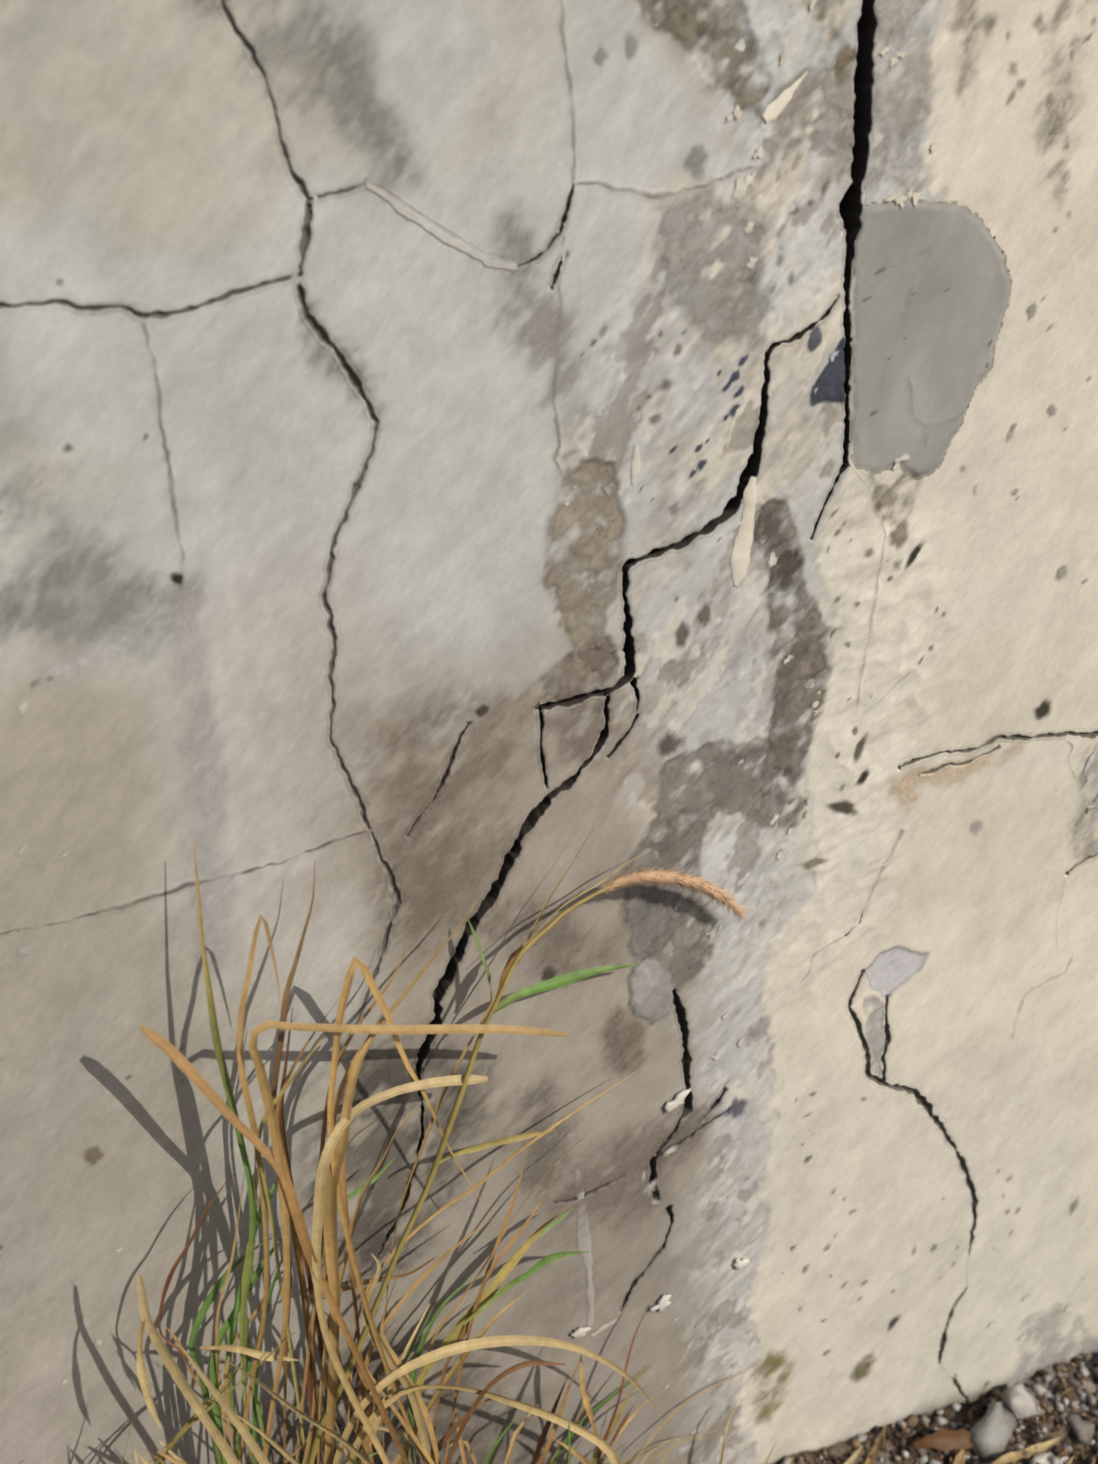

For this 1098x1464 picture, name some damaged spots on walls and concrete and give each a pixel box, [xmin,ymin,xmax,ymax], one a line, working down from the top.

peeling [639,0,856,340]
peeling [870,0,939,207]
crack [0,0,766,1050]
water stain [548,700,604,755]
flaking render [543,458,625,700]
crack [371,0,914,1264]
water stain [661,735,680,753]
water stain [677,605,710,645]
water stain [806,858,825,868]
peeling [864,946,928,1076]
crack [555,990,728,1338]
crack [845,972,989,1404]